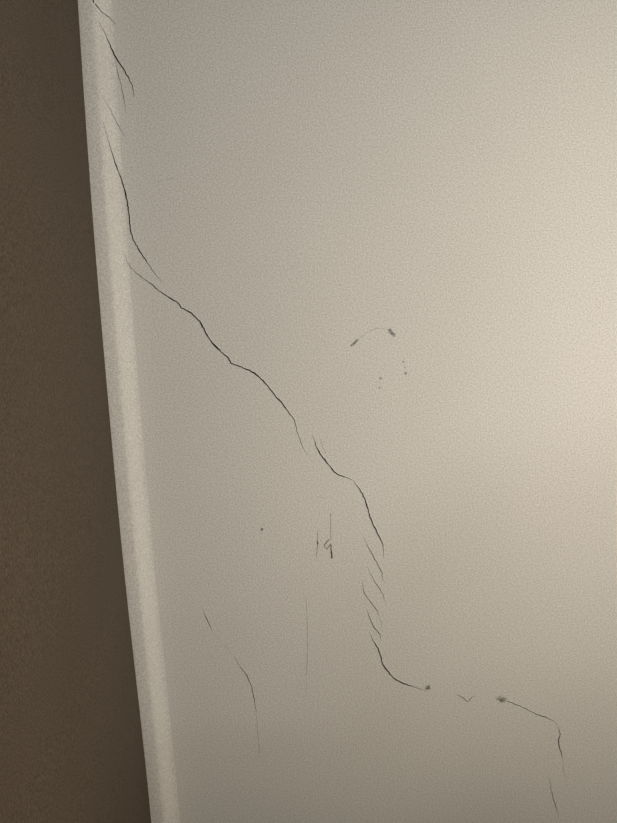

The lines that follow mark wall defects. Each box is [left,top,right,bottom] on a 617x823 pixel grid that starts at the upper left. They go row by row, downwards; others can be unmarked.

crack [92,0,426,697]
crack [203,610,261,759]
crack [497,696,567,817]